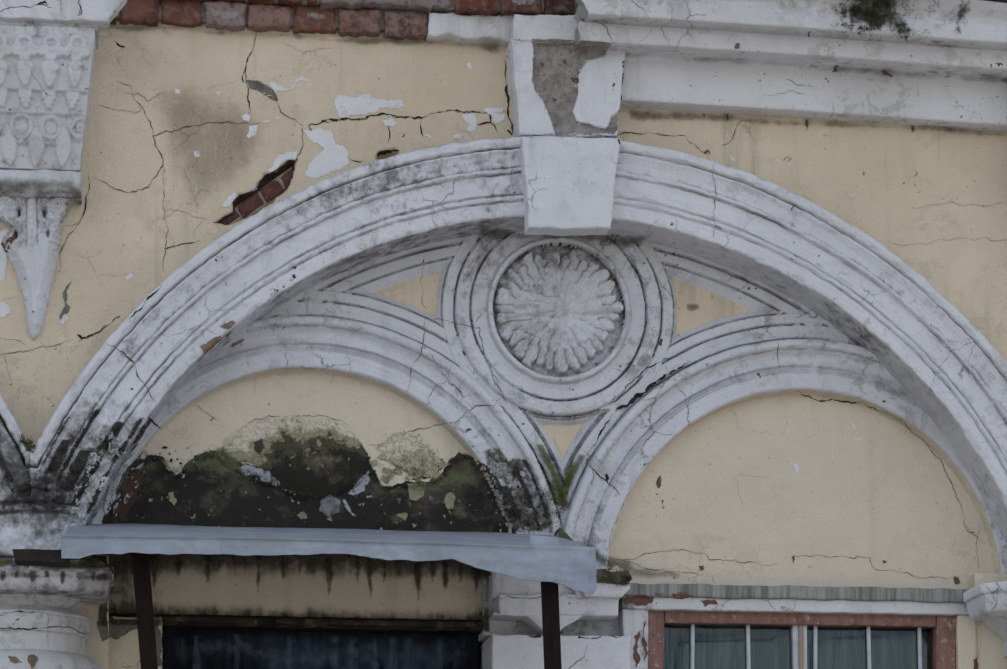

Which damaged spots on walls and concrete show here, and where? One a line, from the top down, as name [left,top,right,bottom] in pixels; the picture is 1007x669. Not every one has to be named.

crack [1,1,82,12]
peeling [334,93,405,127]
flaking render [532,39,618,135]
flaking render [214,128,350,225]
crack [0,32,739,429]
water stain [0,409,144,514]
crack [586,358,770,583]
water stain [0,553,137,626]
water stain [149,554,492,592]
water stain [153,607,489,631]
peeling [633,620,648,667]
crack [797,391,1006,667]